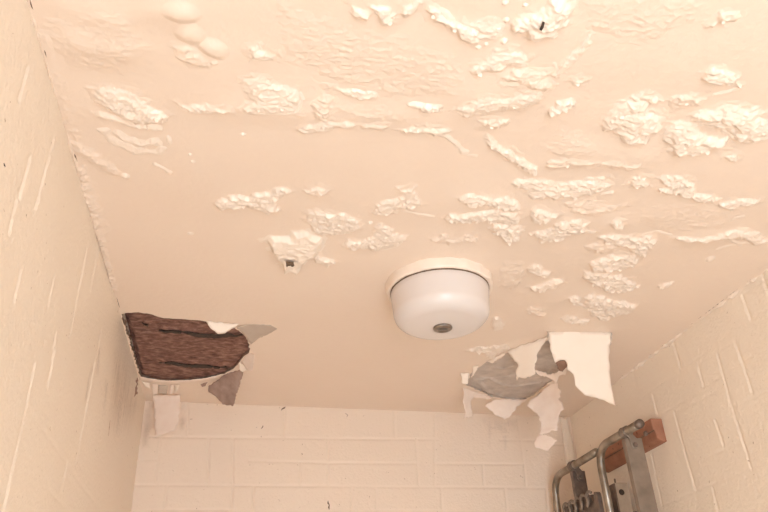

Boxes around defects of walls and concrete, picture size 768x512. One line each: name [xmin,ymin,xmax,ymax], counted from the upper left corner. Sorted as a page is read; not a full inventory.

peeling [257,228,335,275]
flaking render [460,332,615,451]